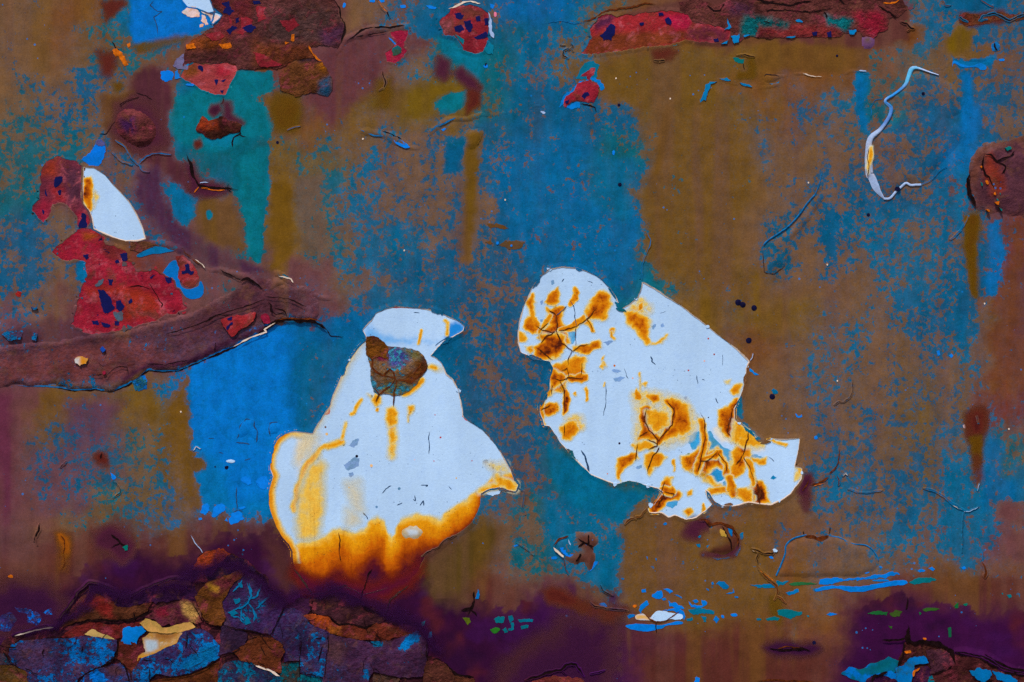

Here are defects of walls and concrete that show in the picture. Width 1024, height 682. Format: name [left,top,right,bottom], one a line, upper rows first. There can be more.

peeling [160,54,240,98]
peeling [179,0,223,27]
peeling [426,1,497,68]
peeling [865,66,962,200]
peeling [29,139,204,336]
rust [0,344,519,653]
peeling [194,302,523,577]
rust [519,286,668,441]
peeling [513,262,818,525]
rust [615,372,788,541]
crack [0,570,400,682]
spalling [626,581,738,633]